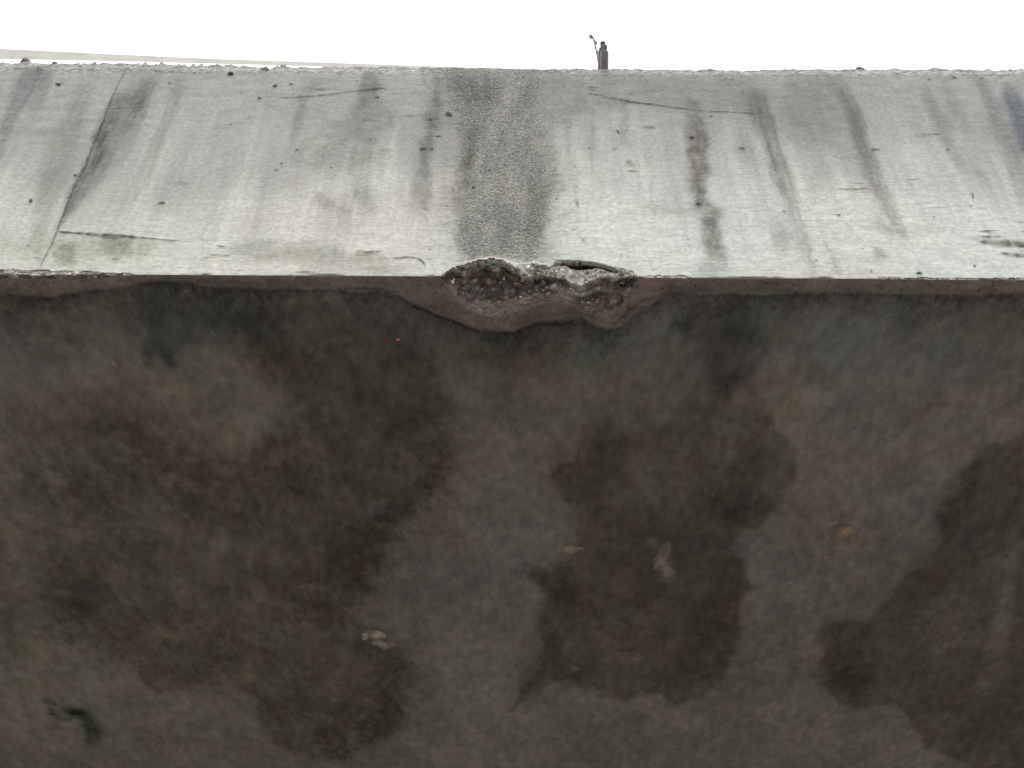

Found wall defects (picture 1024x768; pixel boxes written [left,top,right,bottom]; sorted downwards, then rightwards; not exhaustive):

crack [56,231,177,241]
spalling [422,69,641,322]